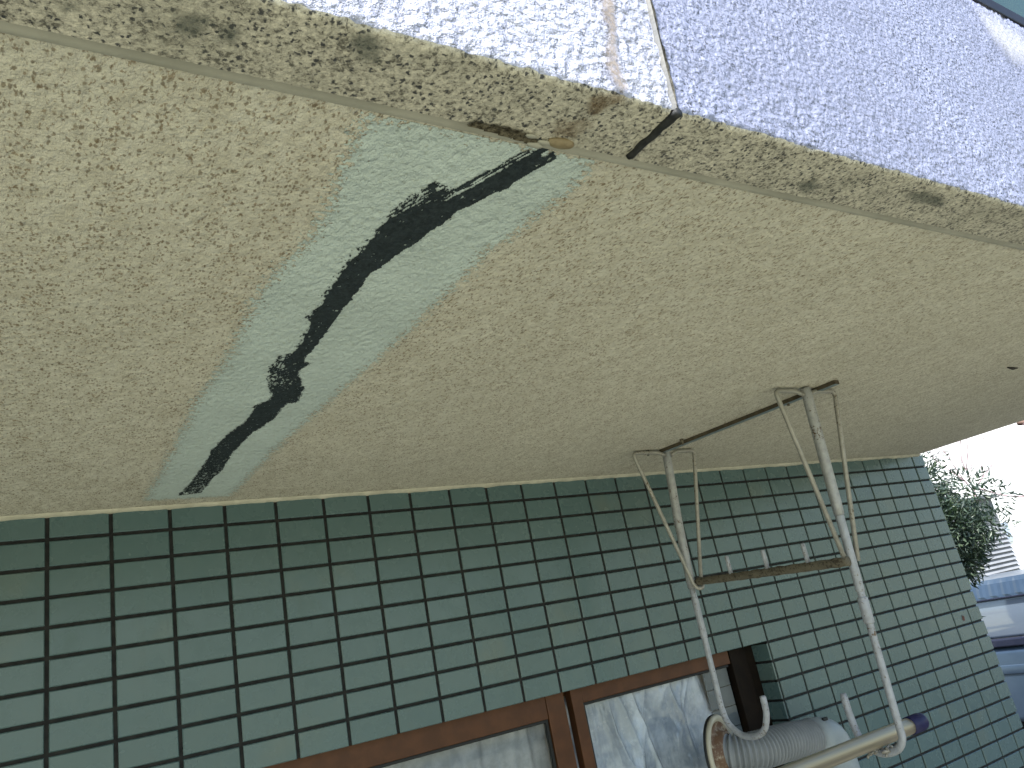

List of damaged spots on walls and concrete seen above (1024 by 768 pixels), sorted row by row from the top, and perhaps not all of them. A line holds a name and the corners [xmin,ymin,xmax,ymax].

crack [178,148,557,496]